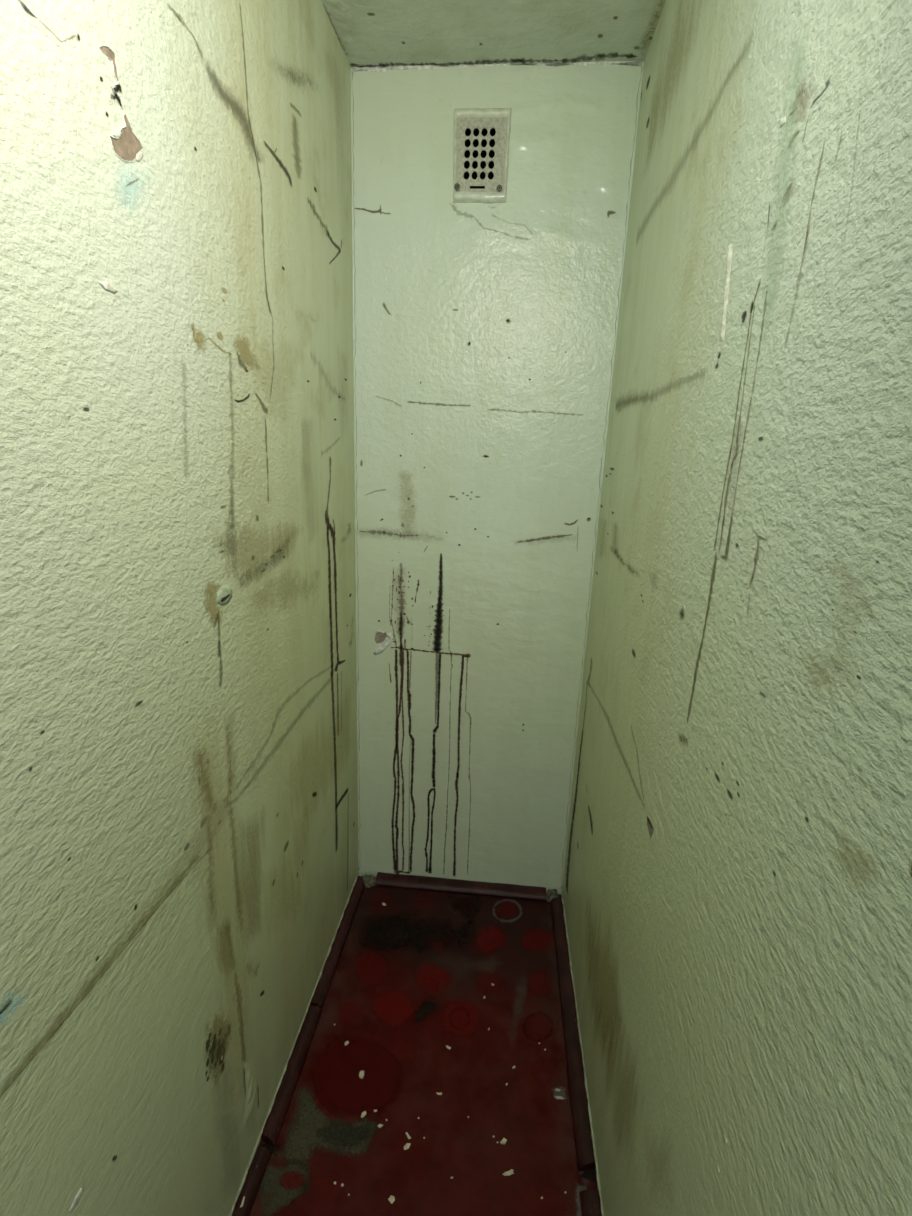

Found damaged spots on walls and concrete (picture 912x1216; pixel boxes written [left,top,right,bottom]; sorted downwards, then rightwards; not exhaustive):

peeling [98,45,144,163]
rust [390,552,419,647]
water stain [206,1017,231,1081]